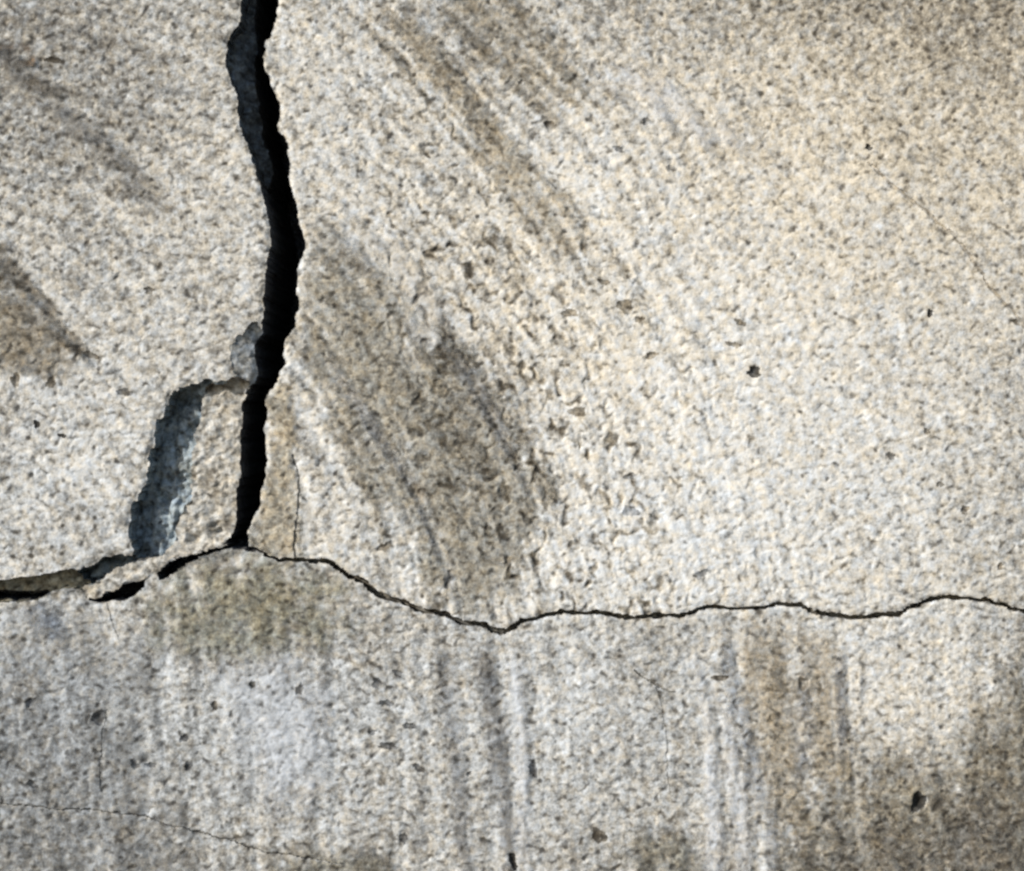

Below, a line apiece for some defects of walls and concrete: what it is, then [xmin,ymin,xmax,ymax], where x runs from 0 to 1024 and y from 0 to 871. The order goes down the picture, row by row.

spalling [77,375,251,599]
crack [0,0,1024,637]